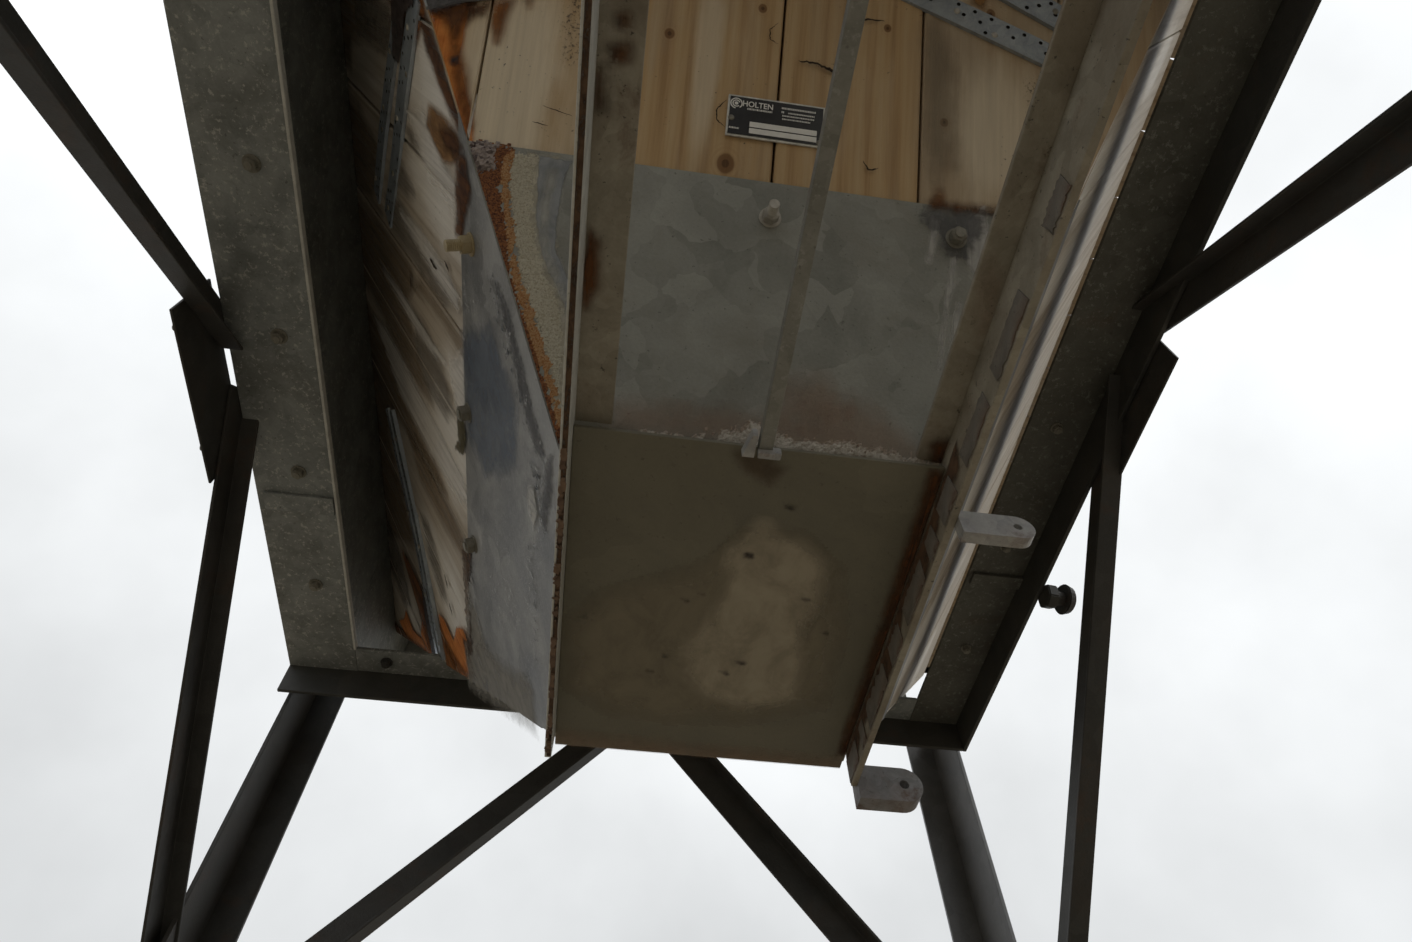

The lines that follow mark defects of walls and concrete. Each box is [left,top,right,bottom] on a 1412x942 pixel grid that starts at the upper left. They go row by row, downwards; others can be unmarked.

corrosion [388,0,601,756]
leakage [569,530,836,717]